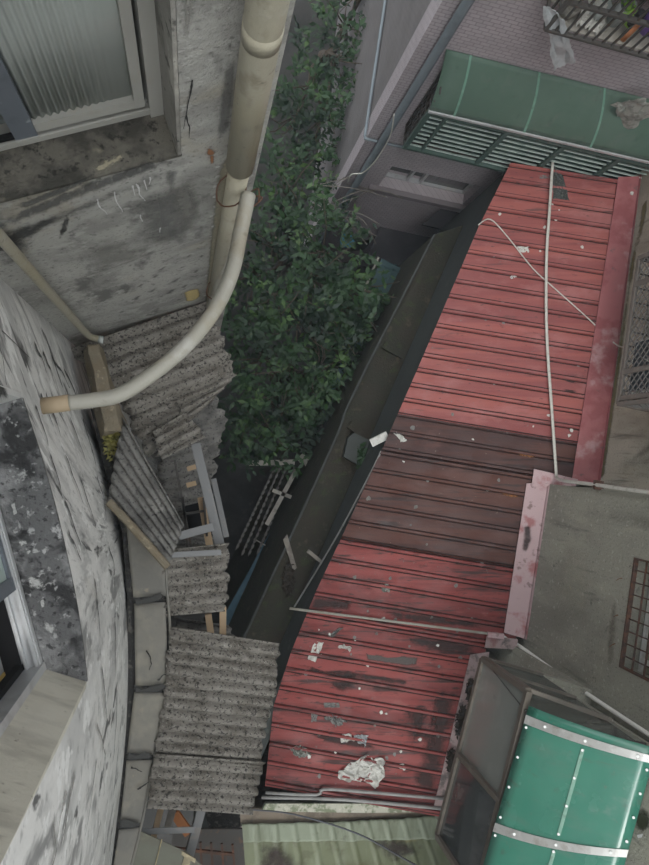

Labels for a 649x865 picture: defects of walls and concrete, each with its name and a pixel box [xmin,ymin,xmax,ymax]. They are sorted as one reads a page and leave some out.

crack [183,80,193,136]
leakage [50,455,81,559]